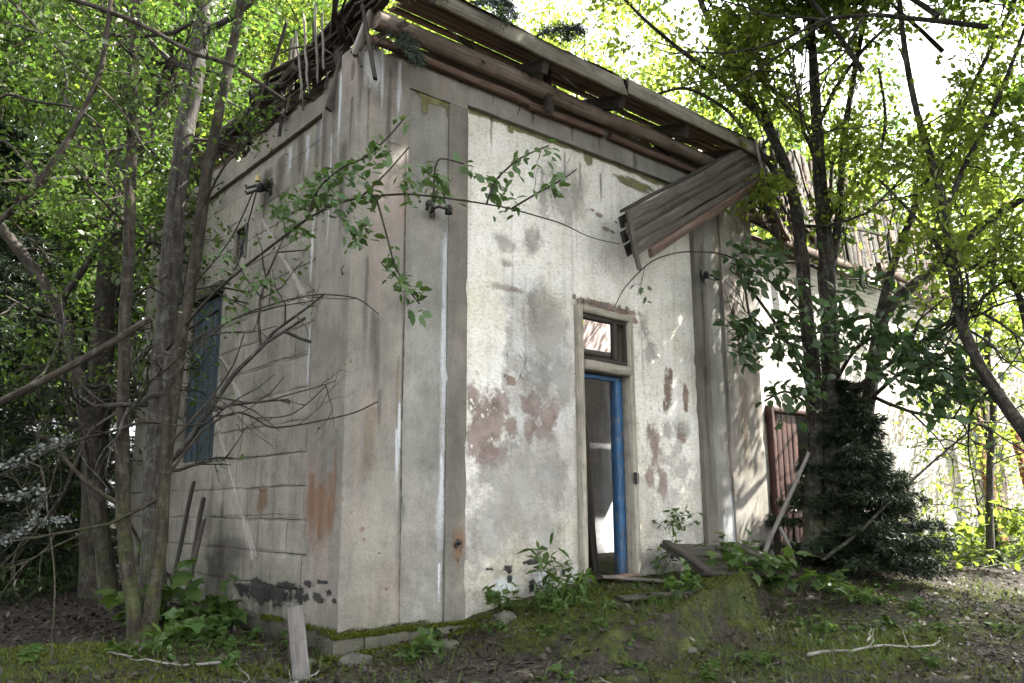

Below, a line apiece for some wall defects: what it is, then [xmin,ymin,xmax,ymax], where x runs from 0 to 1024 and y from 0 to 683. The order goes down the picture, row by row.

damp [365,49,384,90]
peeling [571,294,694,497]
peeling [467,367,565,555]
peeling [233,581,248,595]
peeling [277,580,336,605]